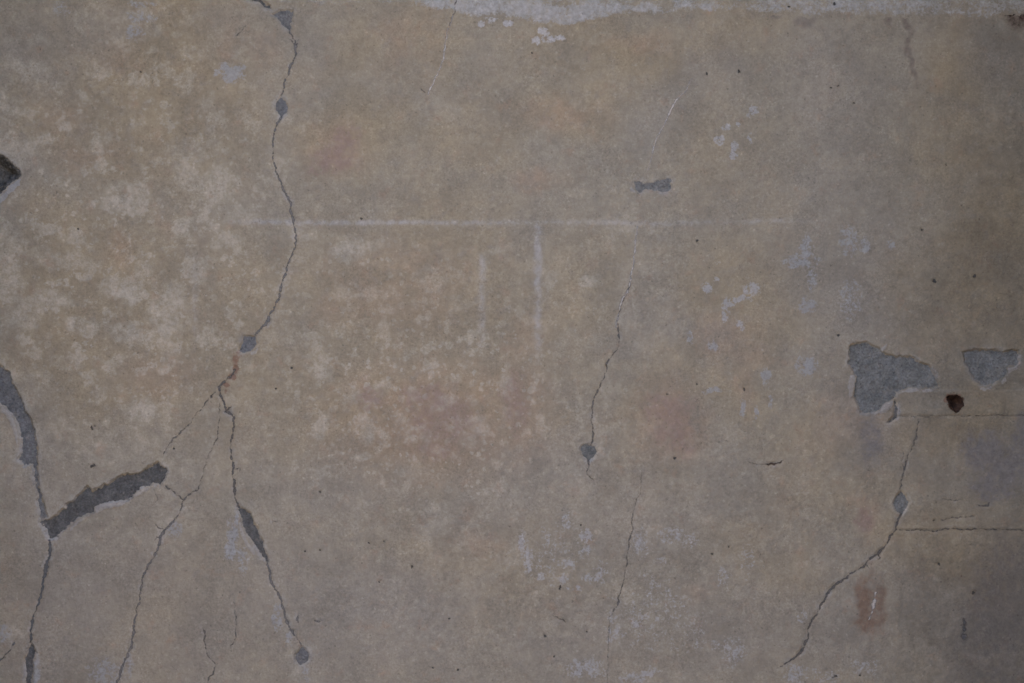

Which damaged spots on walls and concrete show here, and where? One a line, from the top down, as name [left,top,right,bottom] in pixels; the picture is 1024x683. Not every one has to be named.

peeling [0,177,23,205]
crack [255,117,297,335]
flaking render [629,178,672,194]
flaking render [0,366,167,539]
crack [163,369,239,506]
crack [586,287,630,478]
flaking render [847,342,938,423]
flaking render [964,349,1019,392]
crack [0,540,52,661]
crack [116,486,199,683]
crack [266,561,320,645]
crack [784,502,1012,665]